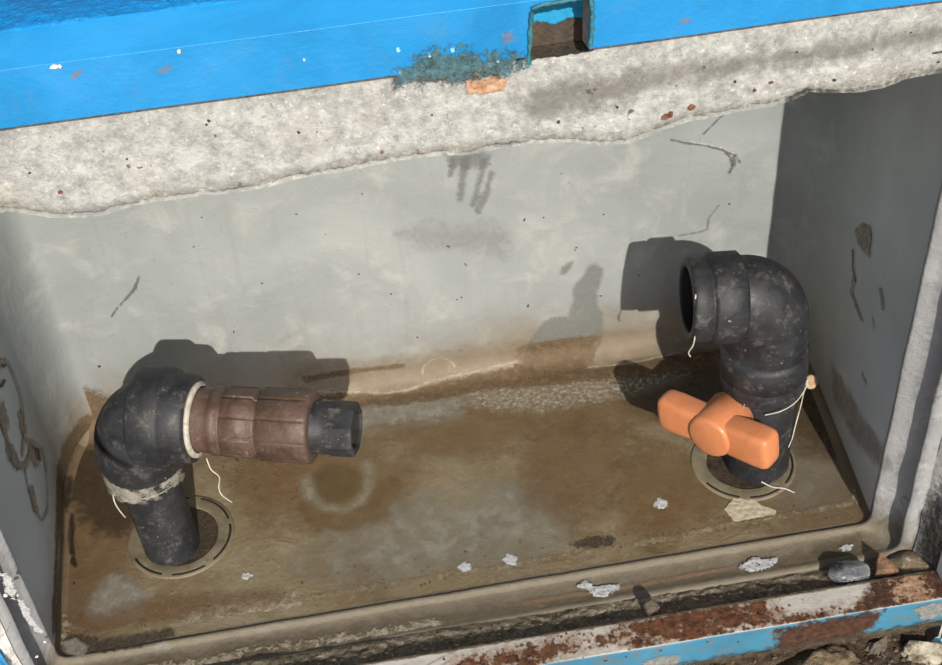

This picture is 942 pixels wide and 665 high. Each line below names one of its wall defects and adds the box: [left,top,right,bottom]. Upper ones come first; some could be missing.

crack [671,115,741,173]
leakage [295,266,725,426]
leakage [796,388,832,453]
leakage [52,391,132,635]
leakage [69,460,598,636]
leakage [613,500,854,550]
rust [443,570,942,665]